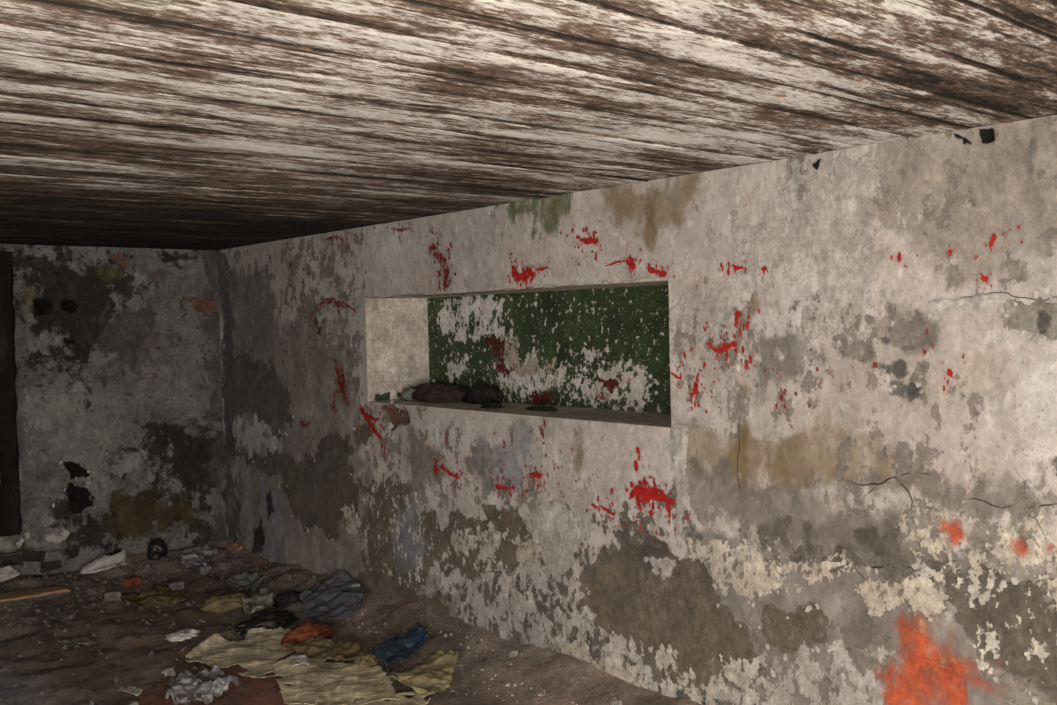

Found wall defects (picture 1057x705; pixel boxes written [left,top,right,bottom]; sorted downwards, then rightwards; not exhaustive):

peeling [921,159,972,236]
peeling [934,254,964,291]
crack [933,292,1053,301]
spalling [997,228,1057,345]
water stain [1,245,375,579]
spalling [59,461,95,514]
peeling [221,228,906,705]
peeling [757,303,1057,705]
crack [849,473,1057,534]
water stain [665,427,1057,705]
peeling [134,661,291,705]